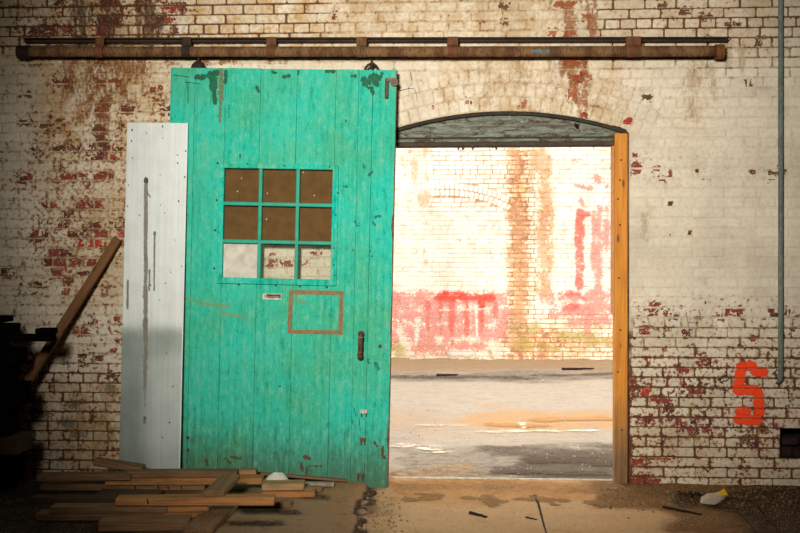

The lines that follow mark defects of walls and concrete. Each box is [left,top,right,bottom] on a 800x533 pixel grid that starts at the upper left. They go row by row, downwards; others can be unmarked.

corrosion [560,0,576,45]
corrosion [585,0,597,37]
corrosion [559,58,591,118]
peeling [49,99,117,163]
peeling [58,172,113,189]
peeling [630,152,672,182]
peeling [33,200,125,298]
peeling [639,300,678,335]
peeling [716,304,745,322]
peeling [77,336,122,369]
peeling [630,378,713,439]
spalling [740,422,800,459]